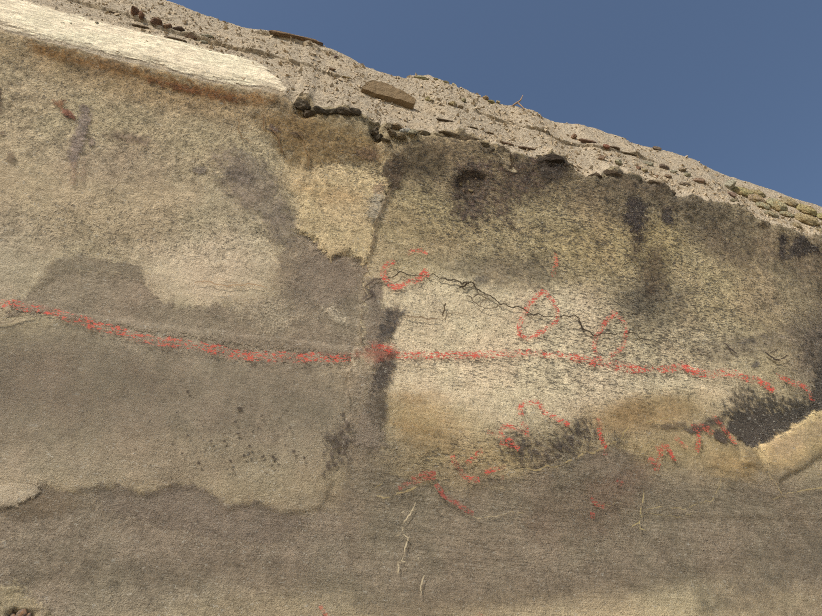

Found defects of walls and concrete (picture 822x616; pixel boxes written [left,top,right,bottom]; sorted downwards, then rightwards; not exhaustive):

leakage [0,131,822,608]
crack [346,177,672,412]